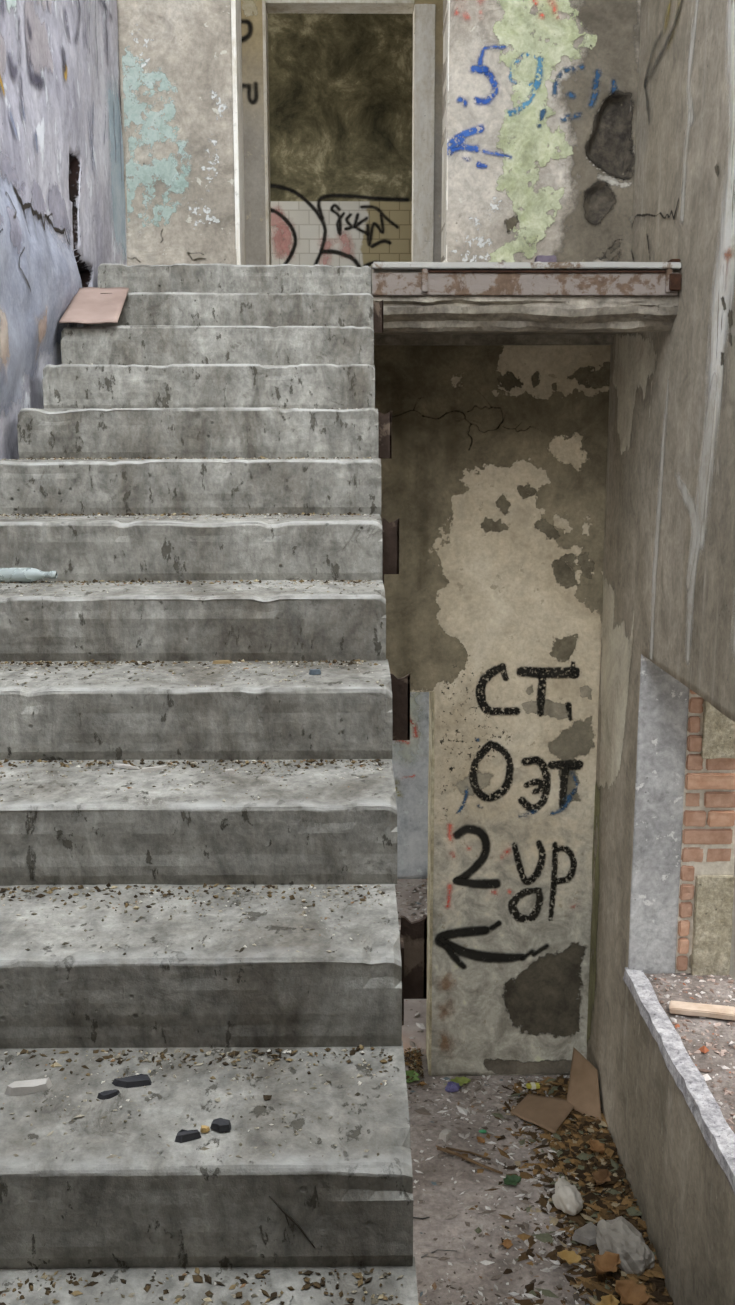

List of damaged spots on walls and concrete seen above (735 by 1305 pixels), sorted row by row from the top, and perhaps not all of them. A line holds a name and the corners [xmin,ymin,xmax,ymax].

peeling [6,0,53,75]
peeling [122,29,220,230]
peeling [452,0,635,262]
crack [0,187,69,292]
spalling [0,151,92,288]
crack [405,395,527,450]
peeling [374,333,657,1042]